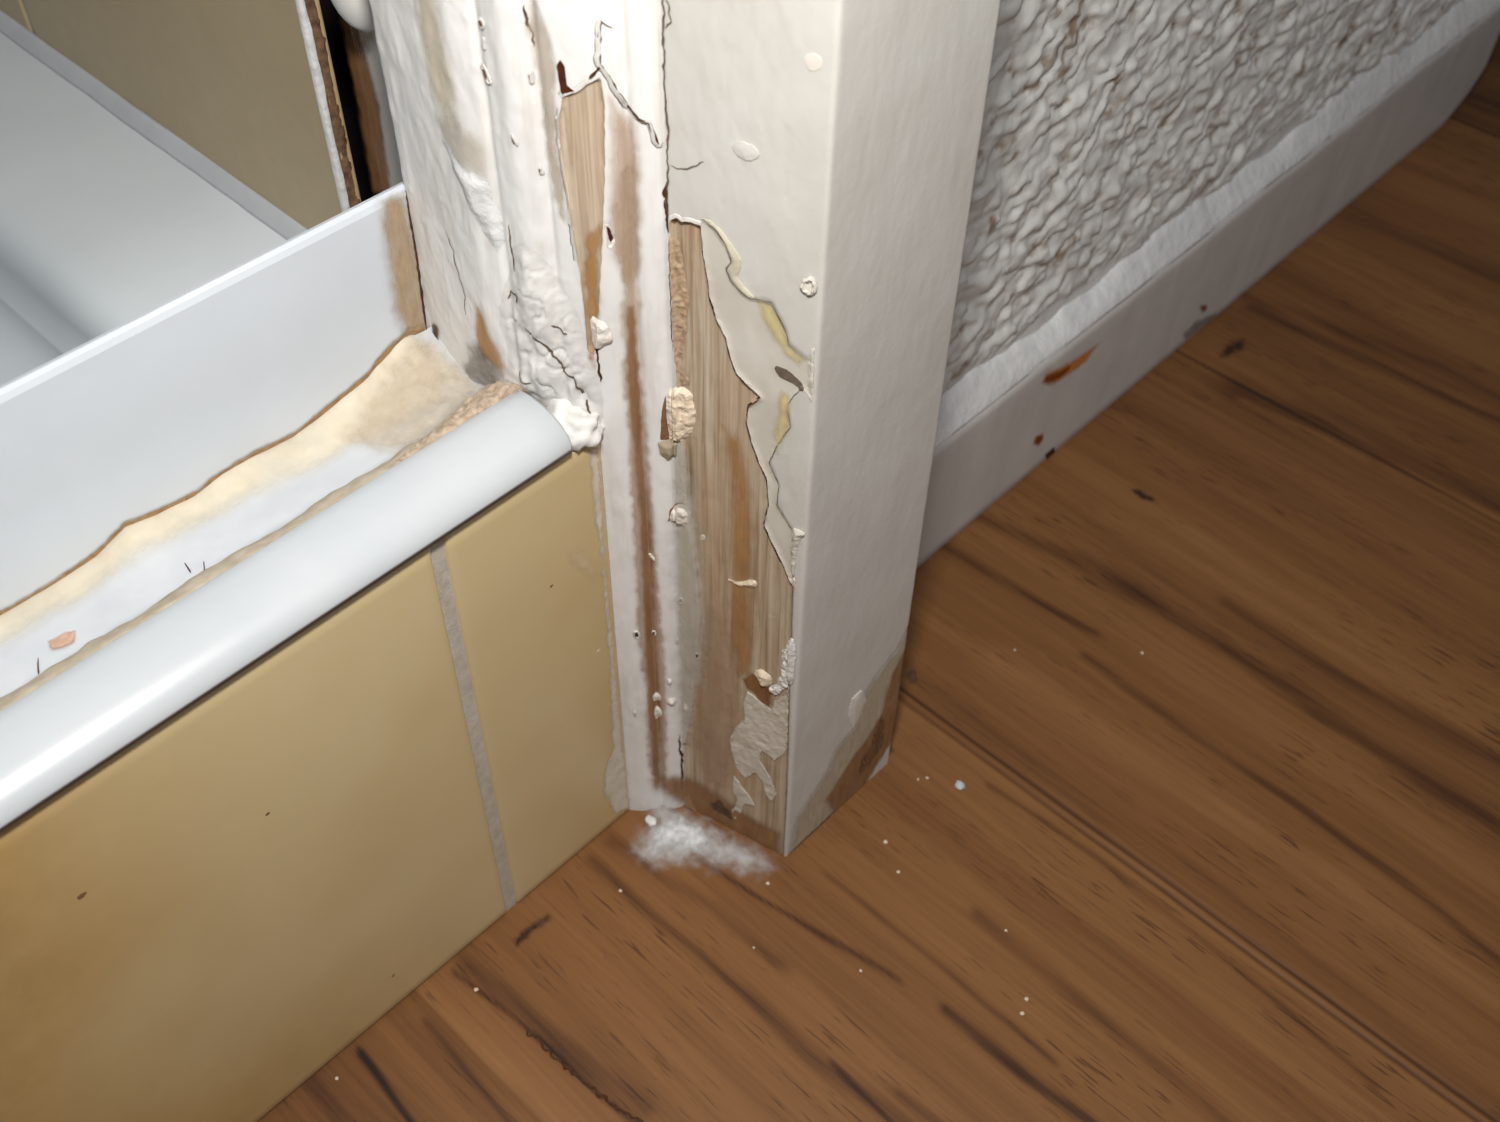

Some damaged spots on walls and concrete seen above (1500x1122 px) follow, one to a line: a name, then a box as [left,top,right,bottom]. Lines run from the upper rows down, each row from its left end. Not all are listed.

damp [0,0,501,638]
peeling [522,2,638,354]
crack [589,0,704,342]
peeling [633,213,810,857]
damp [623,169,907,854]
peeling [800,276,818,296]
corrosion [1044,346,1096,383]